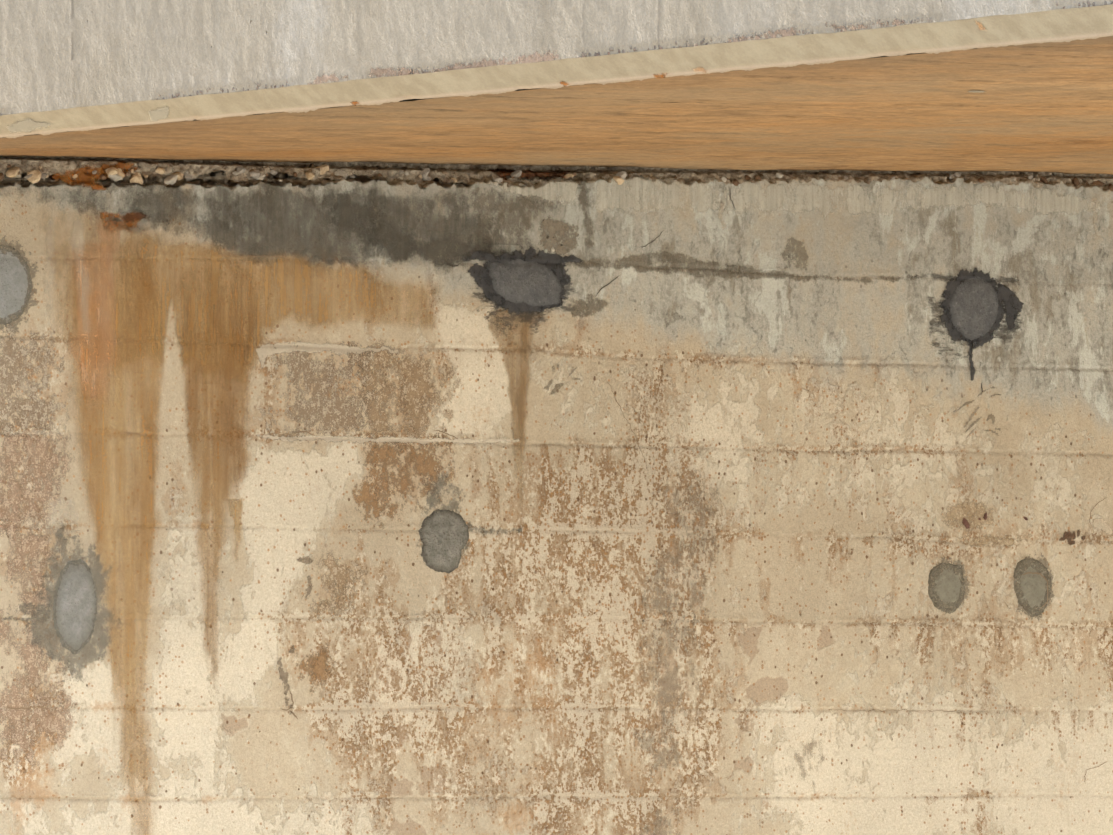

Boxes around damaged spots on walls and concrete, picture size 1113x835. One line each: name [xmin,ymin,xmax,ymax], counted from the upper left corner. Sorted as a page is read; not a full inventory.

rust [52,161,138,190]
spalling [0,156,1113,193]
rust [491,311,533,447]
rust [74,212,431,776]